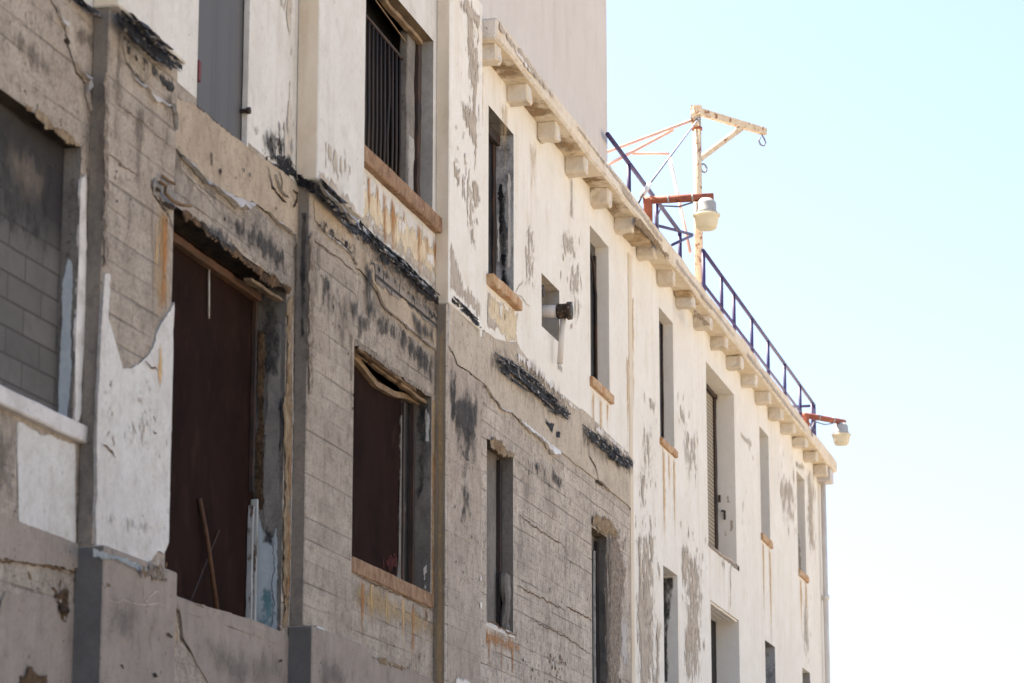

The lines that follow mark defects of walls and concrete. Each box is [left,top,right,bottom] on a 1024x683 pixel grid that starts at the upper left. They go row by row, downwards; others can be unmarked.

peeling [118,10,180,64]
peeling [454,0,481,249]
flaking render [92,72,175,606]
rust [152,195,173,300]
damp [300,213,438,382]
rust [364,179,436,275]
spalling [152,81,661,683]
damp [453,387,477,522]
crack [587,438,609,489]
crack [520,515,571,563]
crack [175,604,204,668]
crack [519,580,592,654]